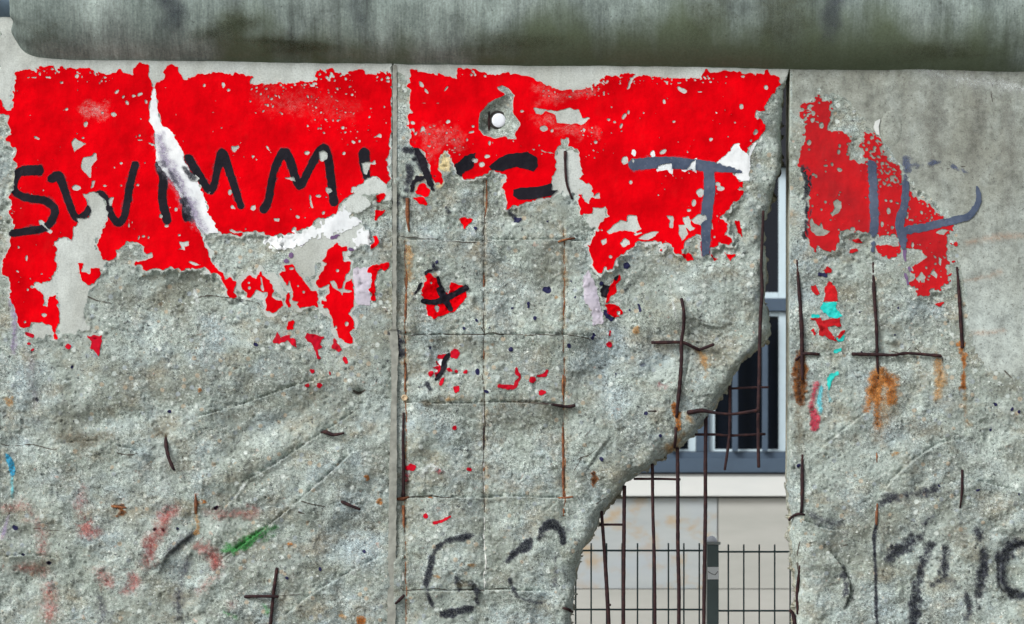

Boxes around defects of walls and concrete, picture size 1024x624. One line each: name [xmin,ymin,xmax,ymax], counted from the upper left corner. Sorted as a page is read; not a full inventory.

spalling [0,62,392,624]
rust [665,402,692,453]
spalling [394,68,1024,624]
rust [791,350,808,426]
rust [864,367,899,427]
rust [933,358,948,400]
rust [956,341,968,407]